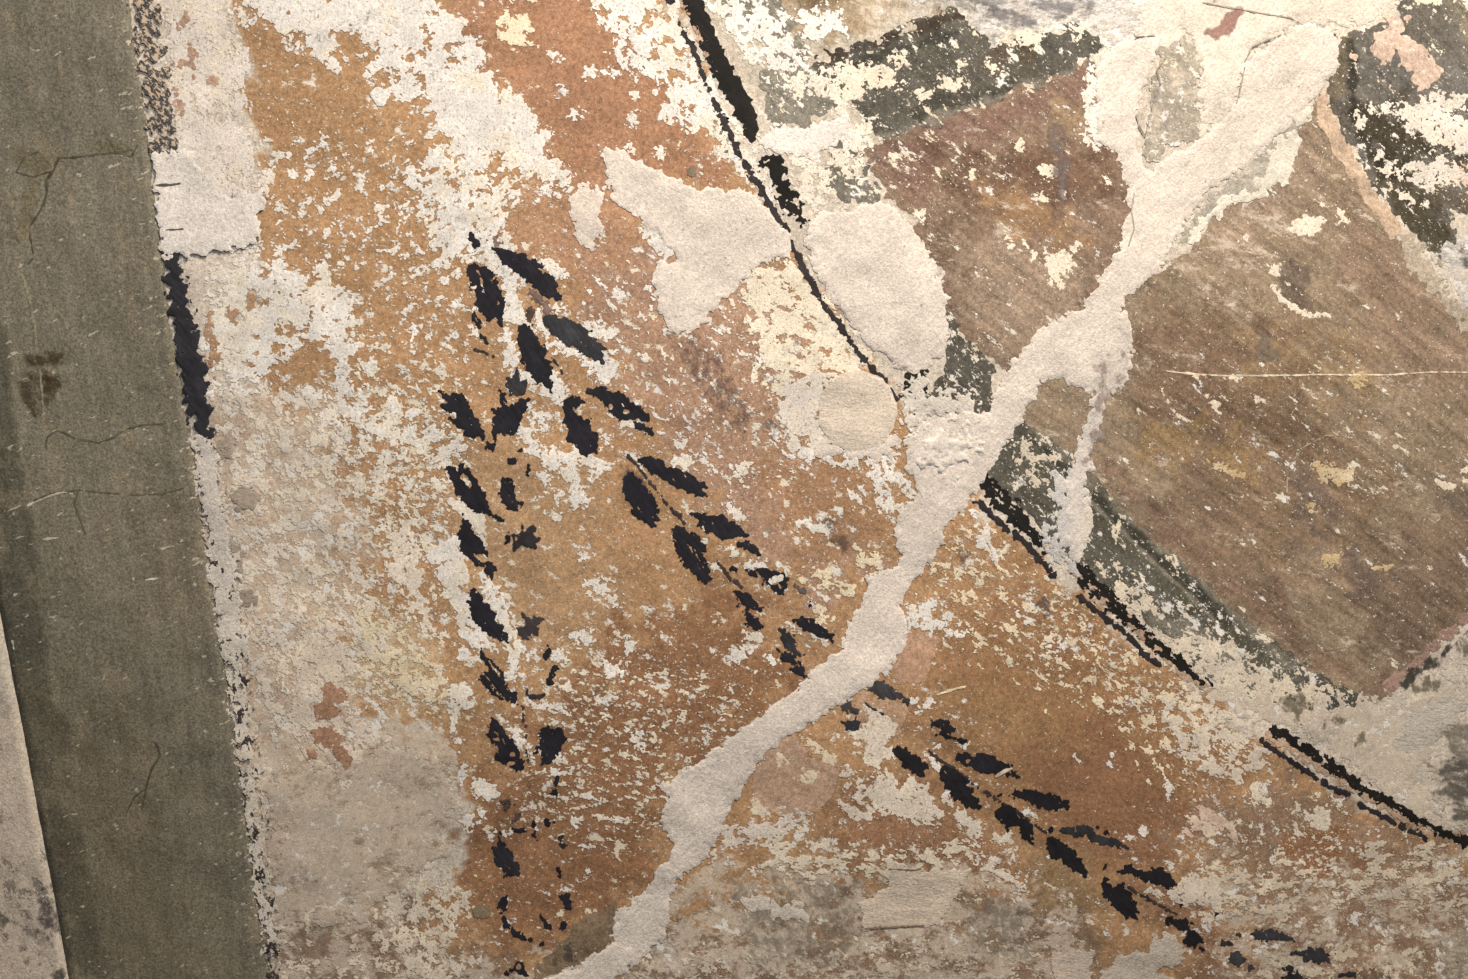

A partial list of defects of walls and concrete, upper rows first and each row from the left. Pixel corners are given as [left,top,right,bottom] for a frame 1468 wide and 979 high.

peeling [1412,0,1442,13]
peeling [1142,34,1209,163]
peeling [1172,120,1306,245]
peeling [1287,205,1352,237]
peeling [1349,87,1468,208]
peeling [1266,263,1331,319]
peeling [1346,370,1371,389]
peeling [146,0,1102,979]
crack [544,0,1342,979]
peeling [1201,457,1246,479]
peeling [1310,459,1354,487]
peeling [904,503,1468,979]